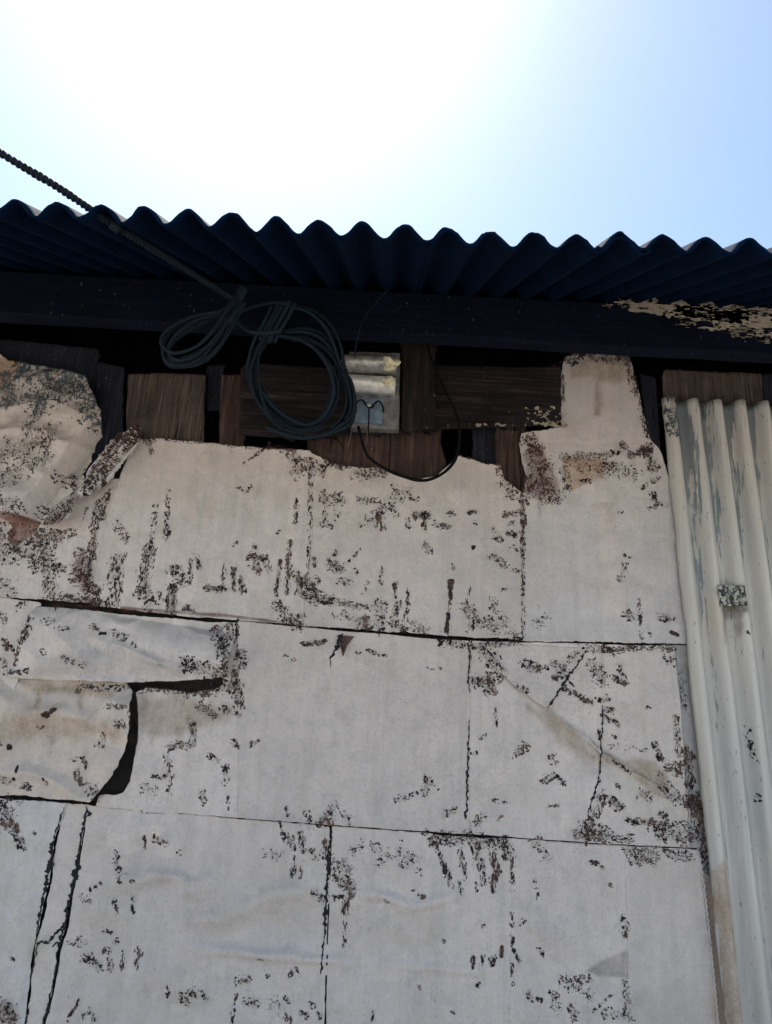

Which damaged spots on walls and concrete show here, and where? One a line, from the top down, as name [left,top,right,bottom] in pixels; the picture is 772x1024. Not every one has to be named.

peeling [602,298,772,344]
corrosion [0,512,41,547]
peeling [0,353,709,876]
crack [465,645,473,693]
crack [548,651,587,708]
crack [463,720,471,819]
crack [588,708,604,814]
crack [25,806,92,1024]
peeling [111,849,135,915]
crack [320,827,332,974]
peeling [421,798,516,895]